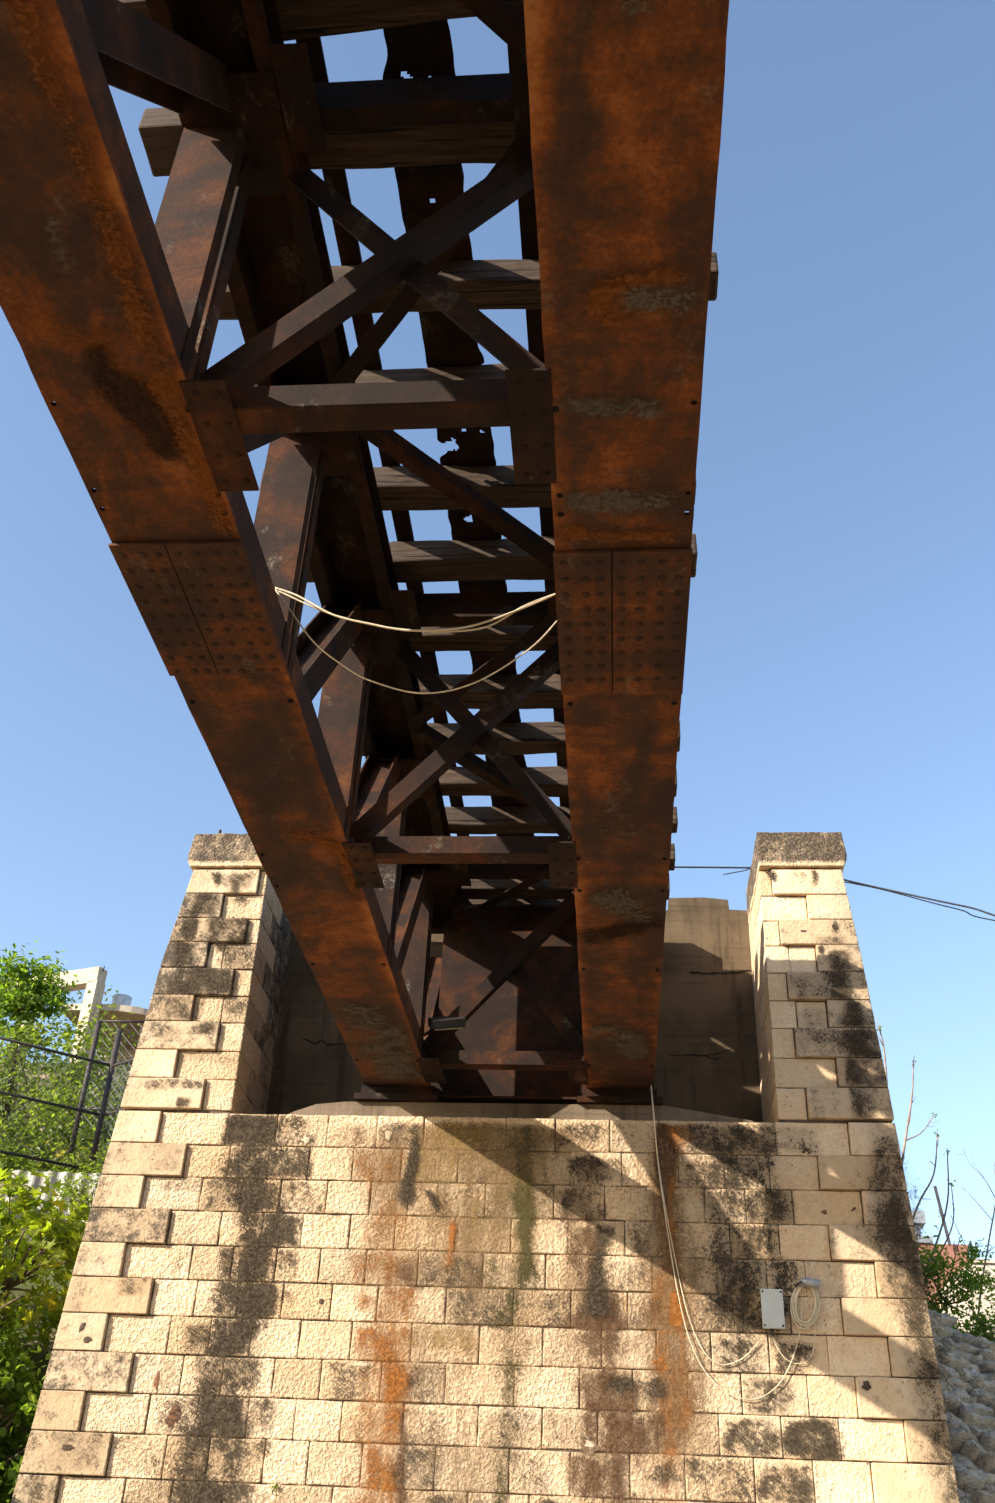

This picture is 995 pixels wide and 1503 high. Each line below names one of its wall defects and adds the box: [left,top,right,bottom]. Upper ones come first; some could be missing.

rust [87,347,184,461]
leakage [211,871,253,903]
leakage [154,1114,326,1503]
rust [351,1143,414,1503]
leakage [379,1121,794,1503]
leakage [861,1136,967,1503]